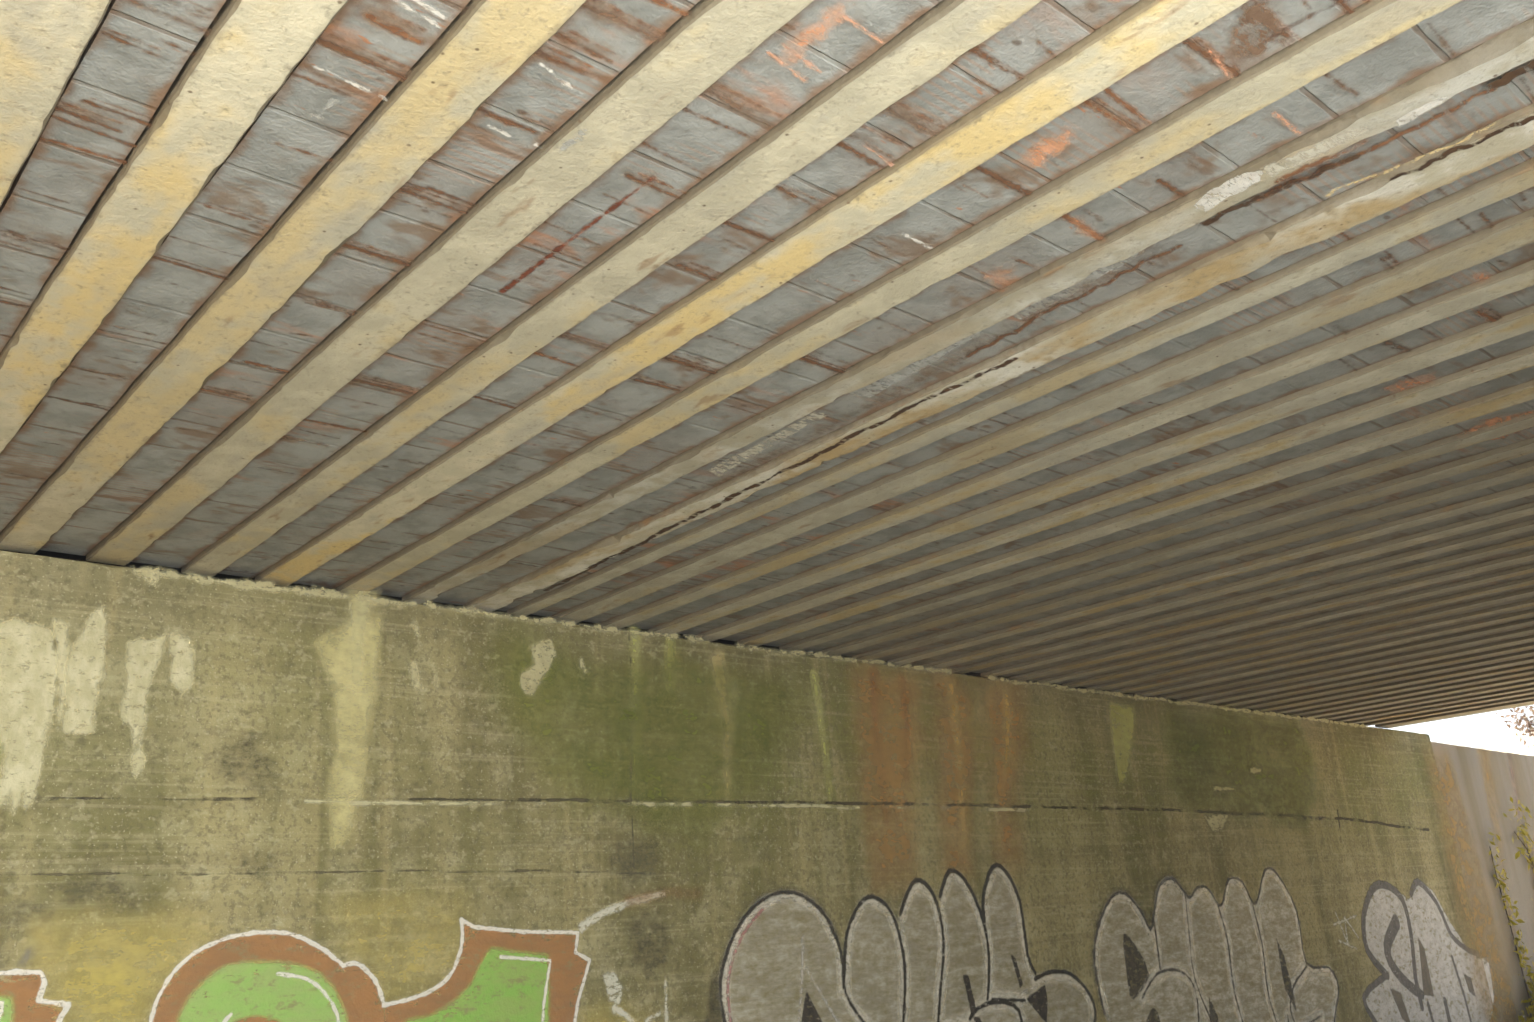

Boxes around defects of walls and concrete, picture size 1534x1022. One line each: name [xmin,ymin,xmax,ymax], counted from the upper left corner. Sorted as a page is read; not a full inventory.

corrosion [1336,0,1355,14]
corrosion [1083,87,1150,131]
crack [1487,60,1534,88]
corrosion [975,166,1032,196]
crack [1202,116,1534,226]
corrosion [663,356,716,375]
crack [544,358,1018,591]
peeling [520,615,702,695]
spalling [737,644,951,674]
peeling [0,611,106,808]
peeling [121,635,194,774]
crack [305,763,1430,874]